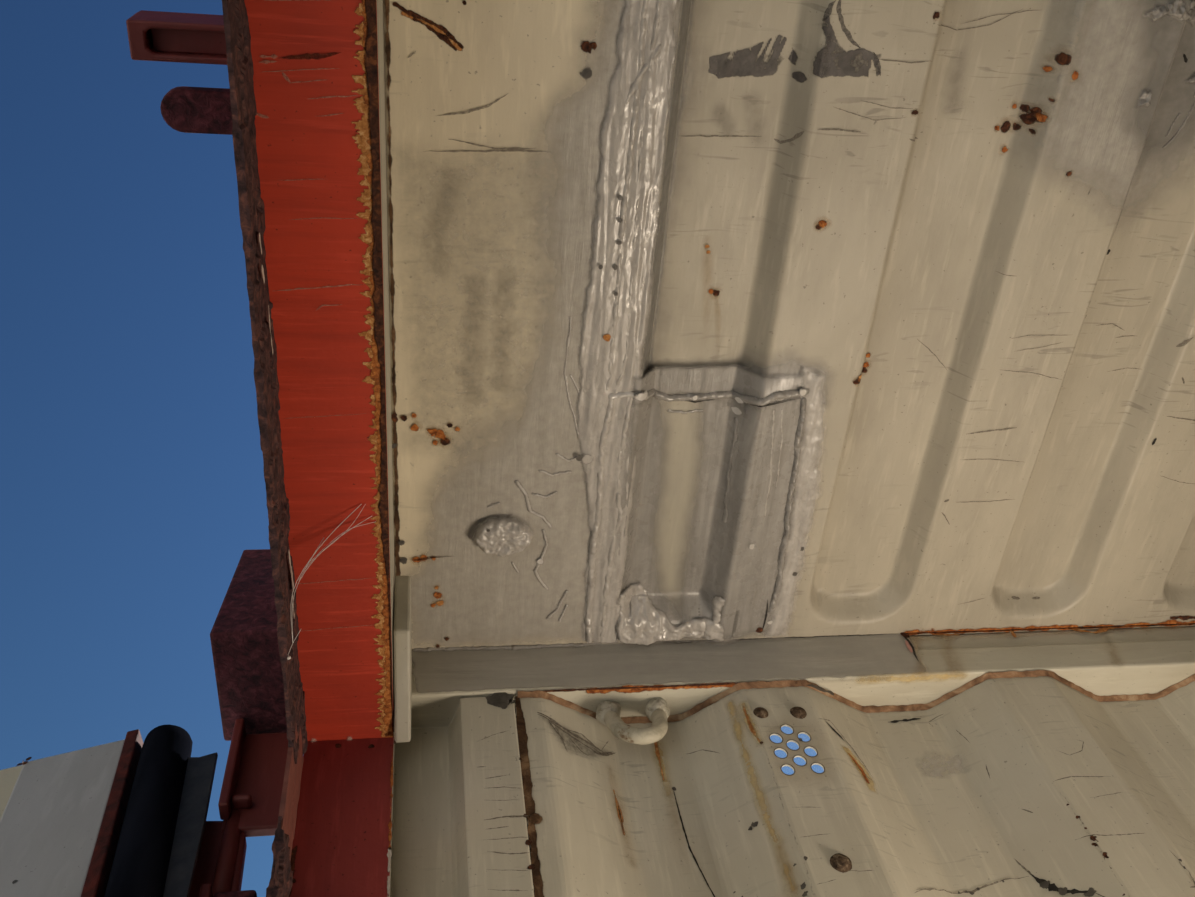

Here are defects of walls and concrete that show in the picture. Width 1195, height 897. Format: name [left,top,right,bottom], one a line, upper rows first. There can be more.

peeling [709,0,881,83]
rust [1043,52,1079,80]
water stain [437,95,506,116]
water stain [423,139,551,152]
rust [995,98,1055,153]
rust [351,0,460,748]
rust [900,616,1195,638]
rust [825,719,874,788]
rust [514,682,742,897]
crack [672,787,715,897]
crack [917,859,1105,897]